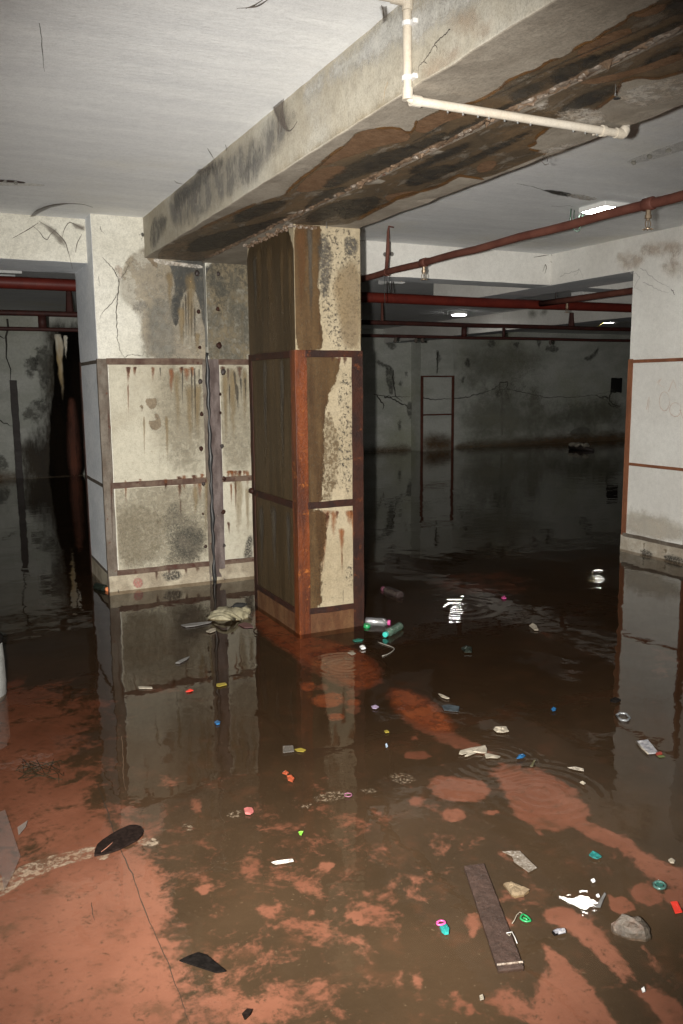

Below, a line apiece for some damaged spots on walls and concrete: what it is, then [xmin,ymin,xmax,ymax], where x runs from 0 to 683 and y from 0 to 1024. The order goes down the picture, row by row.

crack [98,226,143,360]
damp [116,0,683,607]
rust [152,367,200,420]
rust [221,367,246,413]
rust [294,224,354,608]